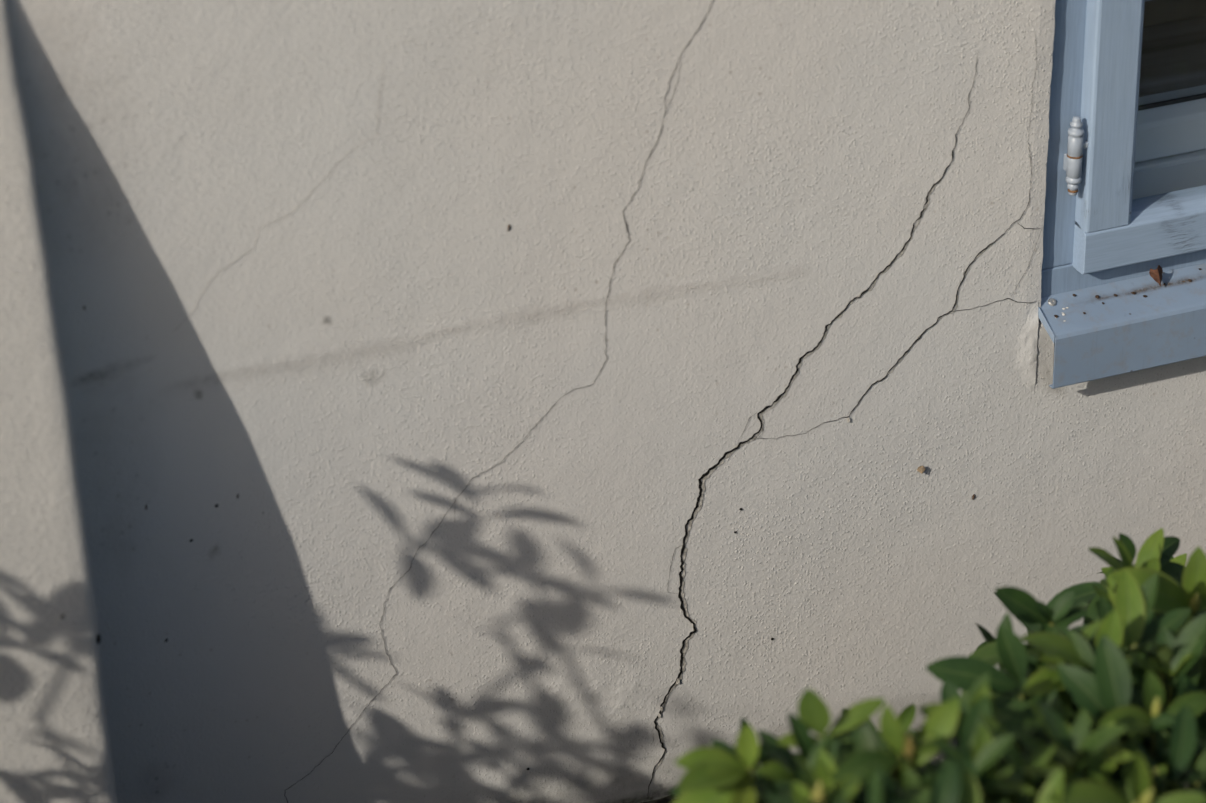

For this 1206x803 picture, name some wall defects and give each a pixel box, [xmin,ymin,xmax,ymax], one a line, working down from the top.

crack [284,0,714,803]
crack [647,36,1045,796]